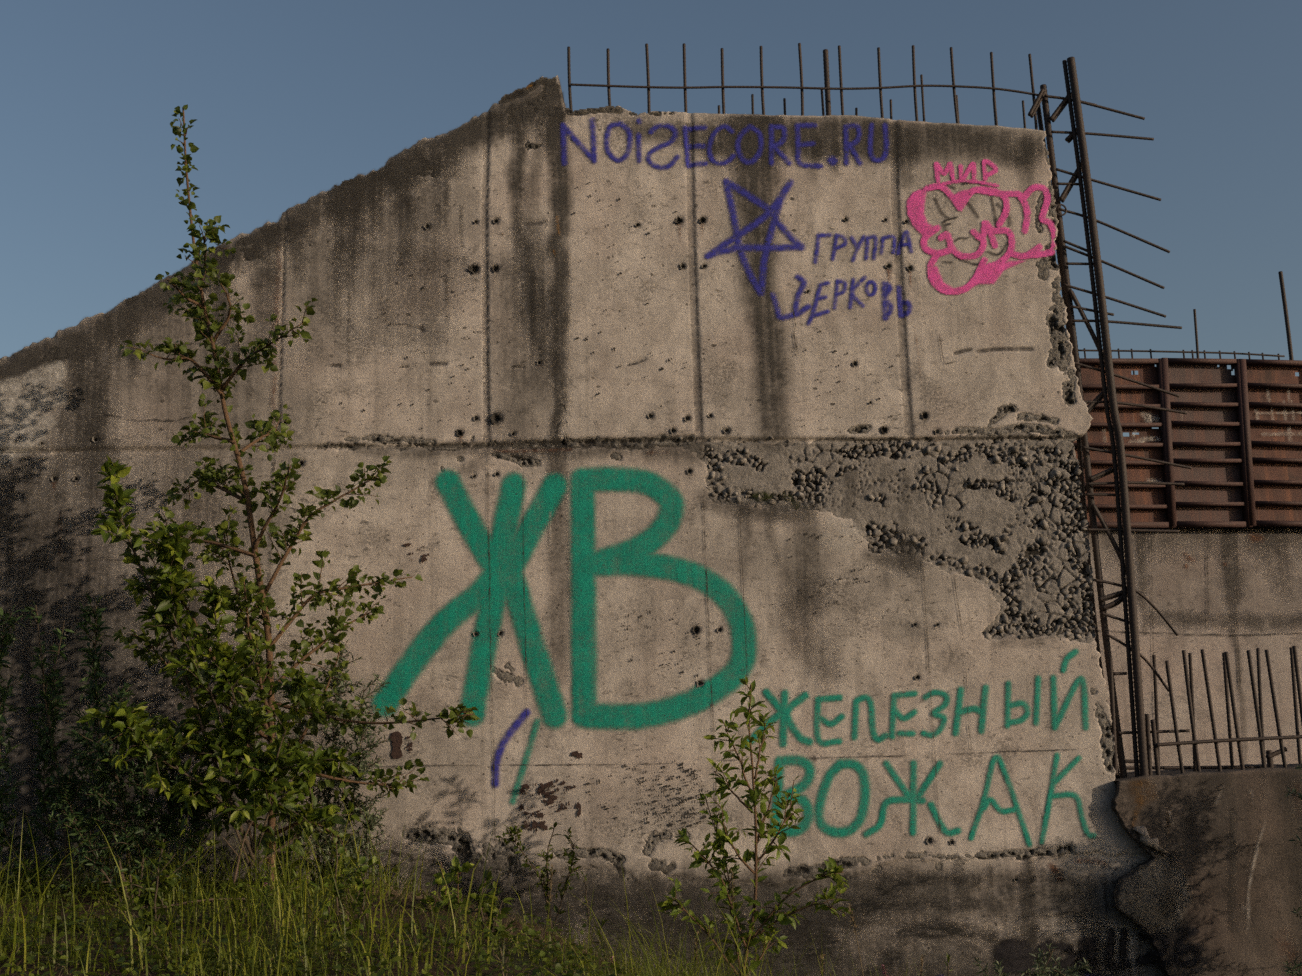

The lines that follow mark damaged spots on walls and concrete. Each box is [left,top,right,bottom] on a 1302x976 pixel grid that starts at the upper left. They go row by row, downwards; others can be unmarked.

water stain [632,115,1044,442]
water stain [0,81,702,887]
spalling [795,323,901,434]
spalling [939,404,1075,440]
water stain [349,852,1166,976]